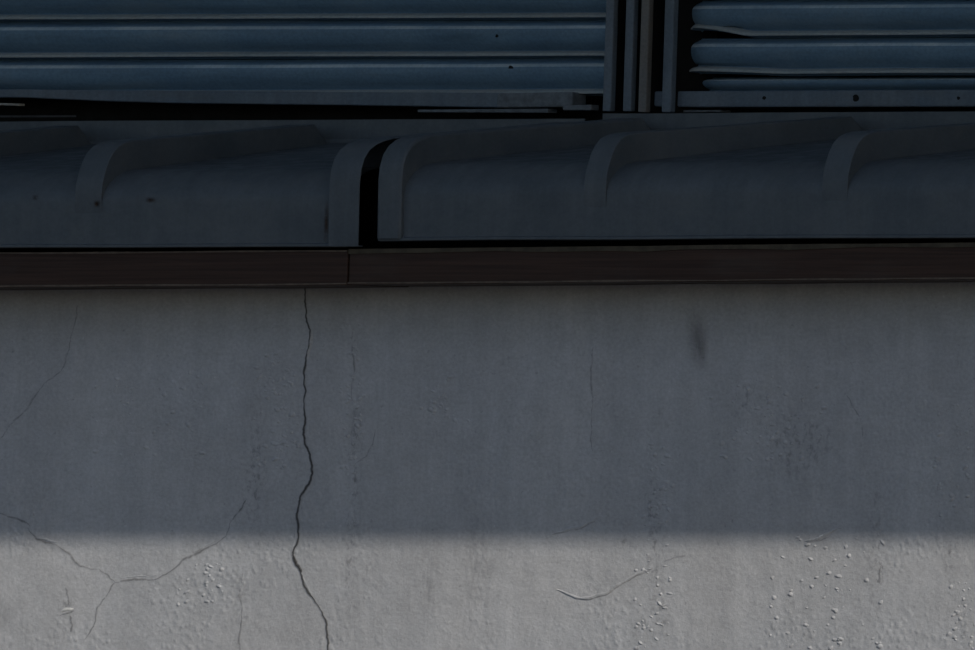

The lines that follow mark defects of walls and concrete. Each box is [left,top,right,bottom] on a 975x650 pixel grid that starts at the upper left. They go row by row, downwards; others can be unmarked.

crack [291,288,329,650]